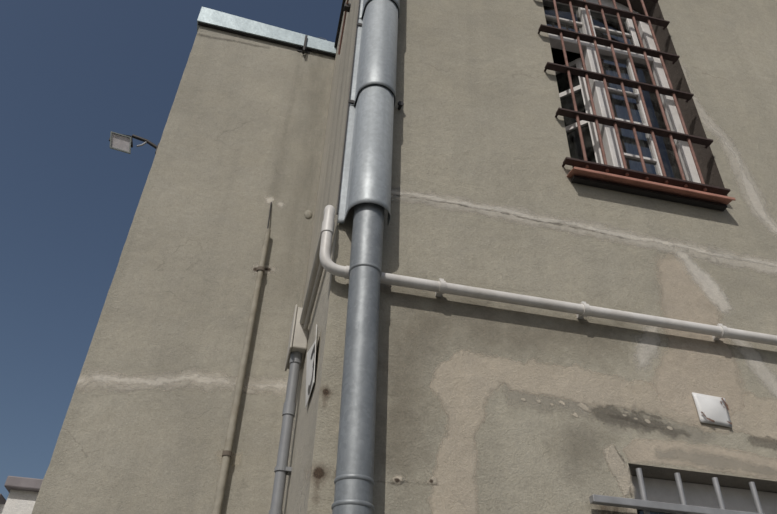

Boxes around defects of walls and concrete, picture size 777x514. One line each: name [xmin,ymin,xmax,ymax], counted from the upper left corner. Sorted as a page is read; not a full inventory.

crack [682,67,777,235]
crack [391,189,777,397]
crack [76,369,288,395]
flaking render [604,445,634,498]